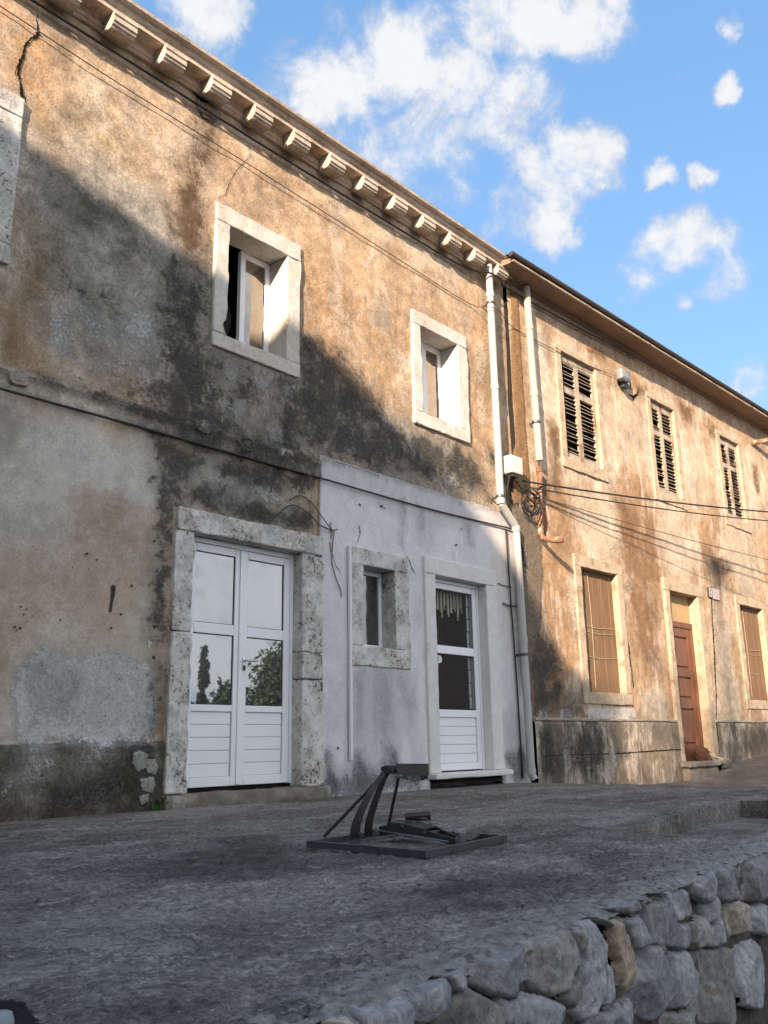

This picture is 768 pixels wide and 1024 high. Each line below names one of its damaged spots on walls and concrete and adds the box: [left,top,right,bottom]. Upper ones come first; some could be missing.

crack [15,16,41,102]
damp [1,116,495,819]
damp [528,613,617,780]
spalling [132,749,158,805]
damp [505,746,526,781]